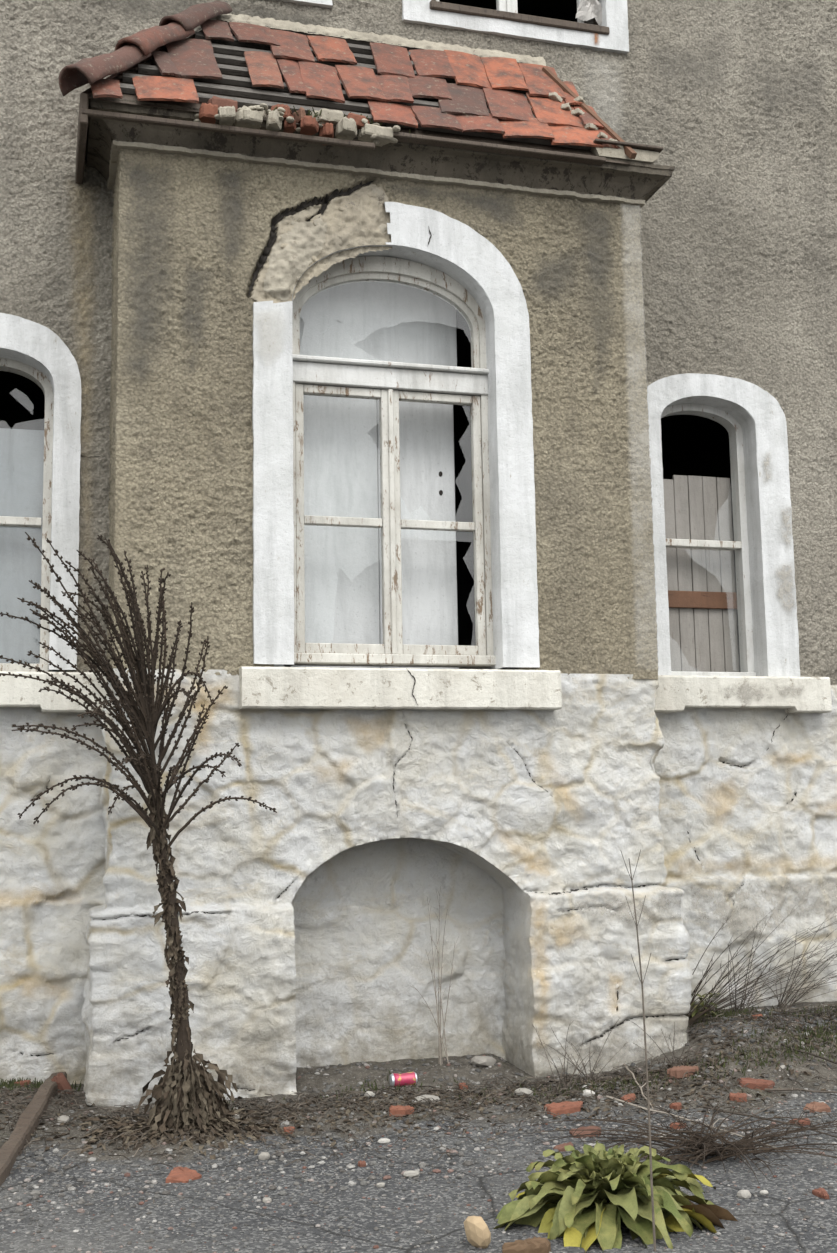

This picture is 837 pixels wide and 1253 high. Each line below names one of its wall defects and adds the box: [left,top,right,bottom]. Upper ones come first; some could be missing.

crack [248,181,373,296]
crack [393,671,418,817]
crack [579,982,685,1046]